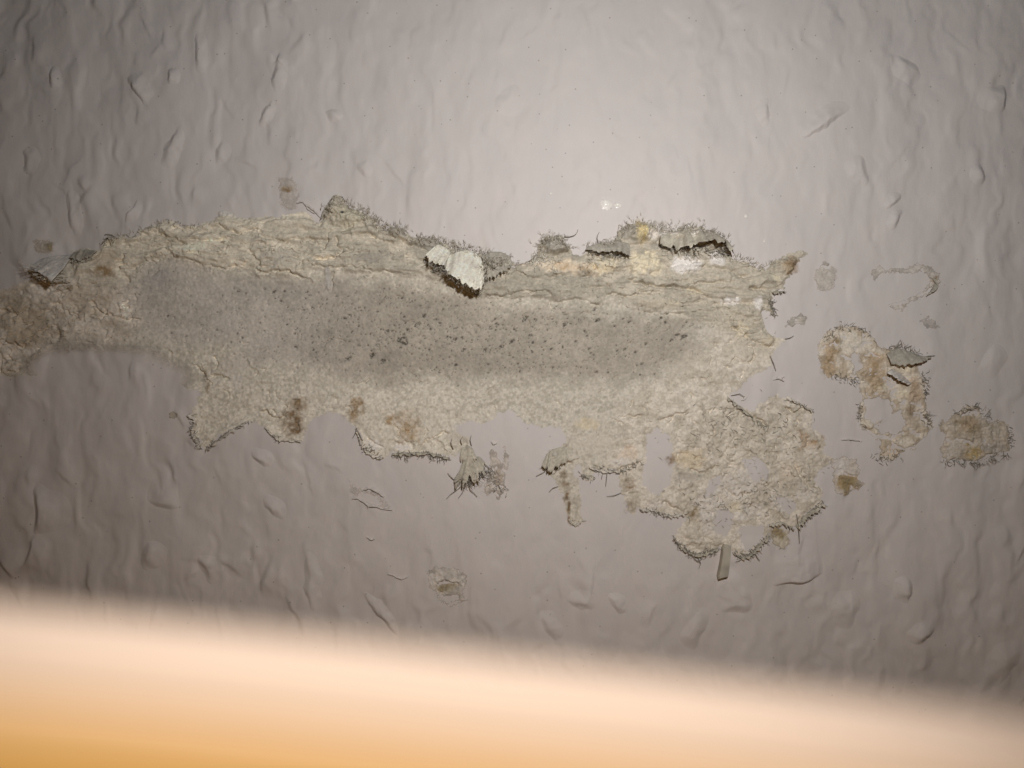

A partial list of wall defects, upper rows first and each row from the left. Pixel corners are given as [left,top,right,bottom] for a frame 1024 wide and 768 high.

peeling [871,263,940,311]
peeling [0,178,864,567]
peeling [818,322,1016,469]
peeling [428,566,467,607]